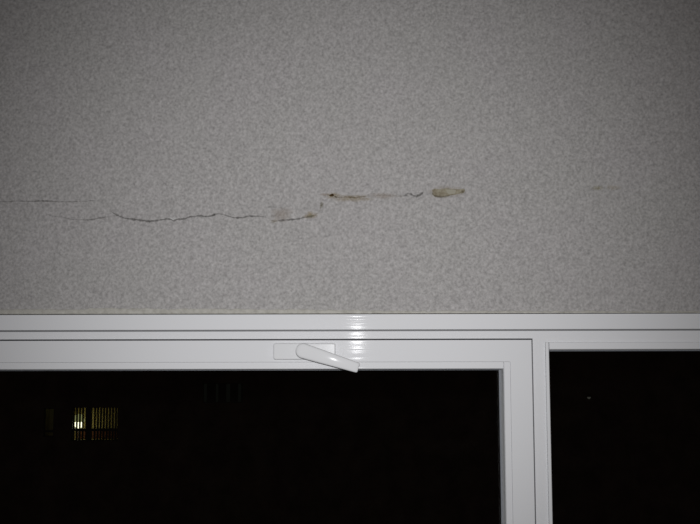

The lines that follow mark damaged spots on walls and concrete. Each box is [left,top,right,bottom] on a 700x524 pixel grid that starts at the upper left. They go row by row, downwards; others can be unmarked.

peeling [432,188,465,197]